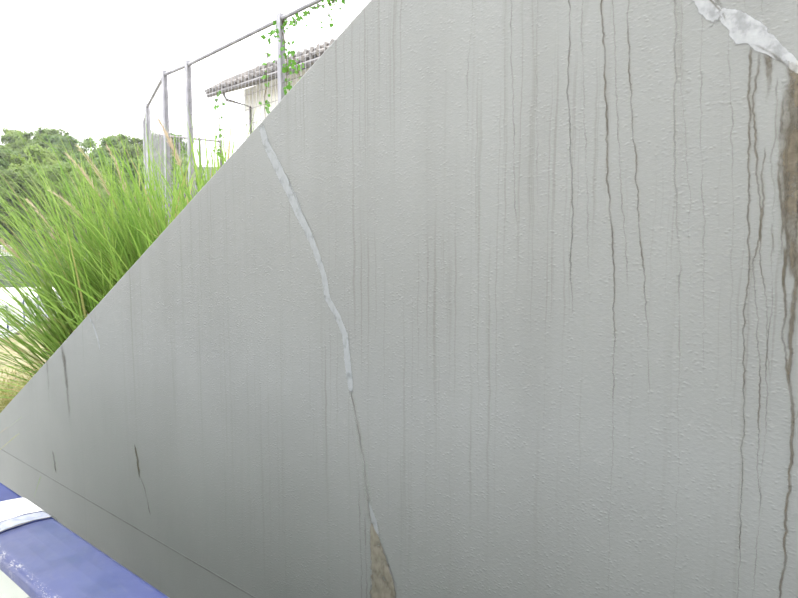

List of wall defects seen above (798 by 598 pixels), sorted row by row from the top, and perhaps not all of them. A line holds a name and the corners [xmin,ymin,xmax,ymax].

crack [692,0,798,73]
crack [259,126,353,400]
corrosion [742,52,772,333]
corrosion [778,69,798,598]